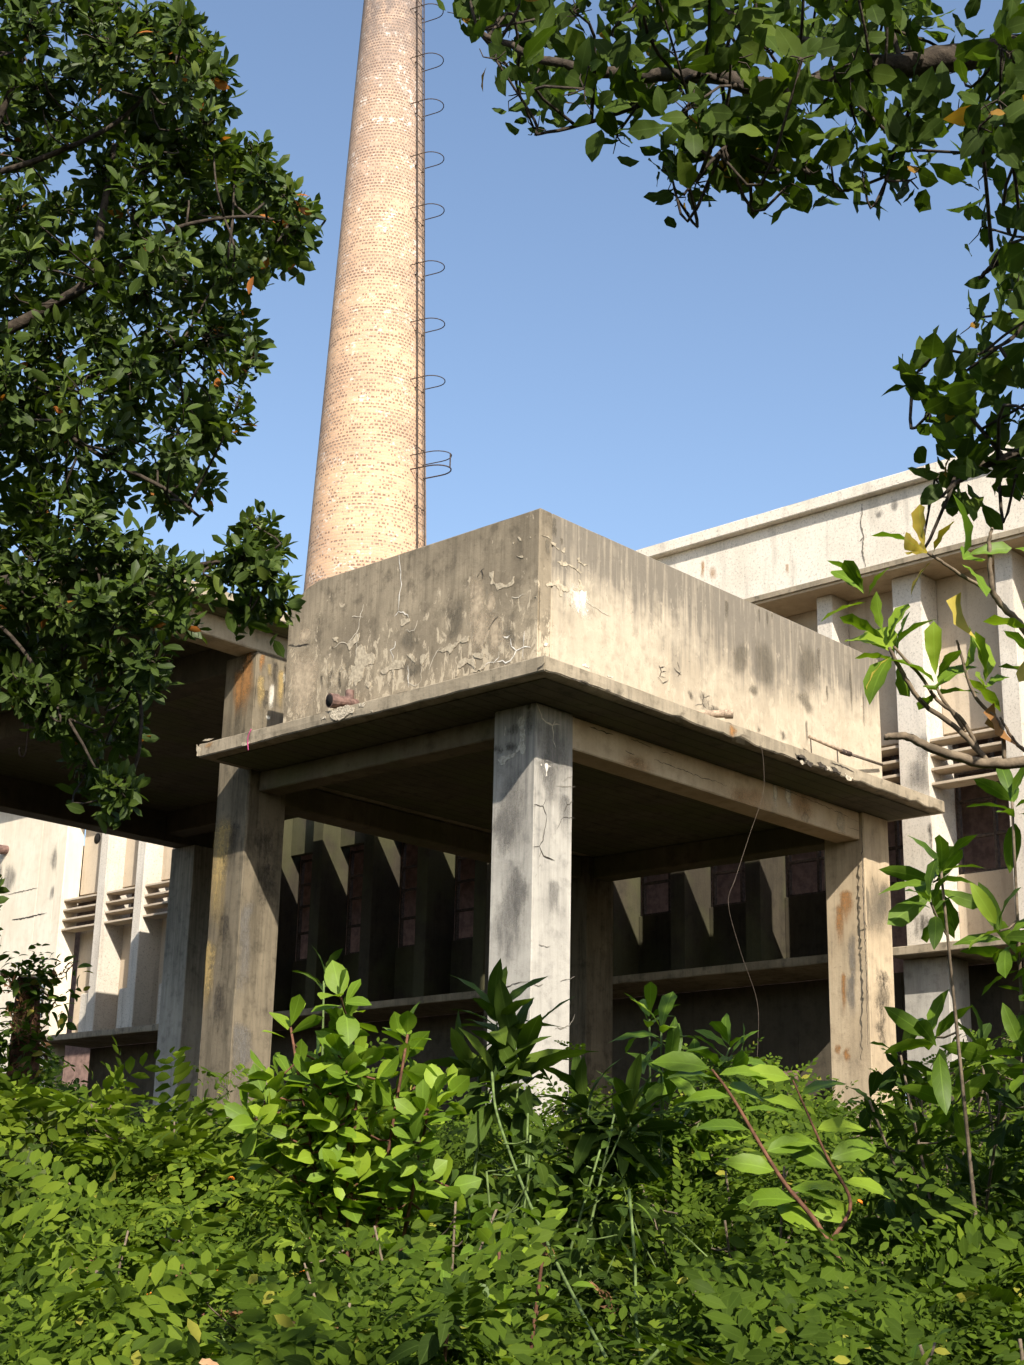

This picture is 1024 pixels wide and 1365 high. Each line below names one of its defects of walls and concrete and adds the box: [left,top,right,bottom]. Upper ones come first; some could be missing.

crack [859,508,867,567]
peeling [513,535,587,606]
damp [571,590,588,616]
peeling [321,571,515,720]
rust [837,891,851,931]